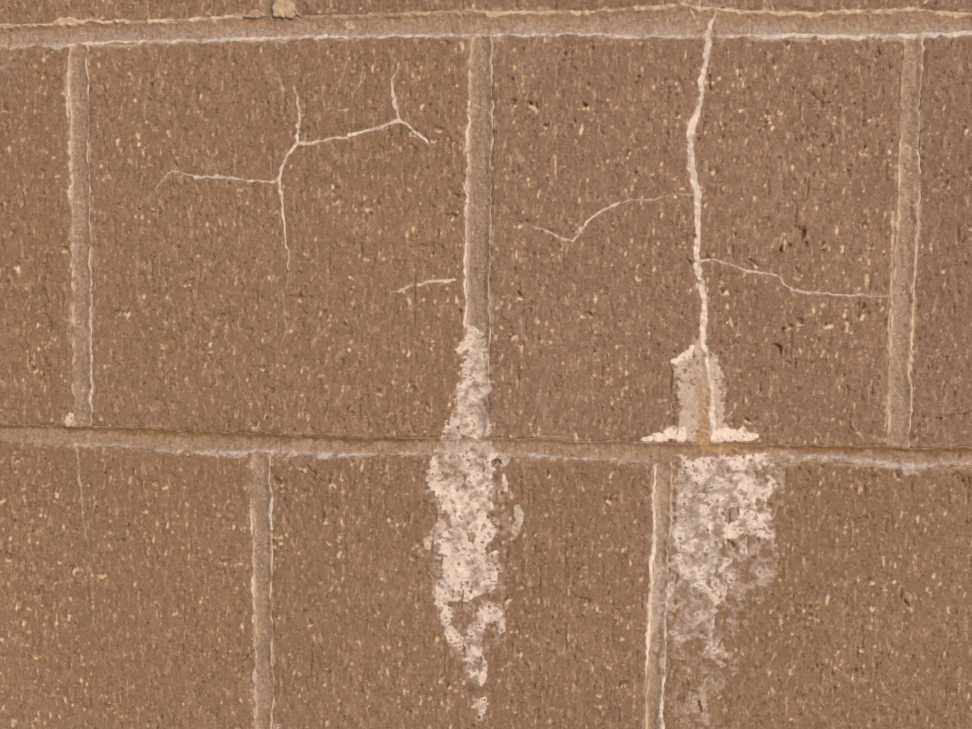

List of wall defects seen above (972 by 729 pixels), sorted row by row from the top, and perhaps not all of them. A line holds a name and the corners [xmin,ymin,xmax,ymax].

crack [162,63,429,268]
crack [397,279,456,292]
crack [540,199,652,242]
crack [686,10,868,354]
damp [909,193,920,371]
damp [103,427,421,458]
damp [423,70,510,721]
damp [512,505,524,540]
damp [640,334,972,729]